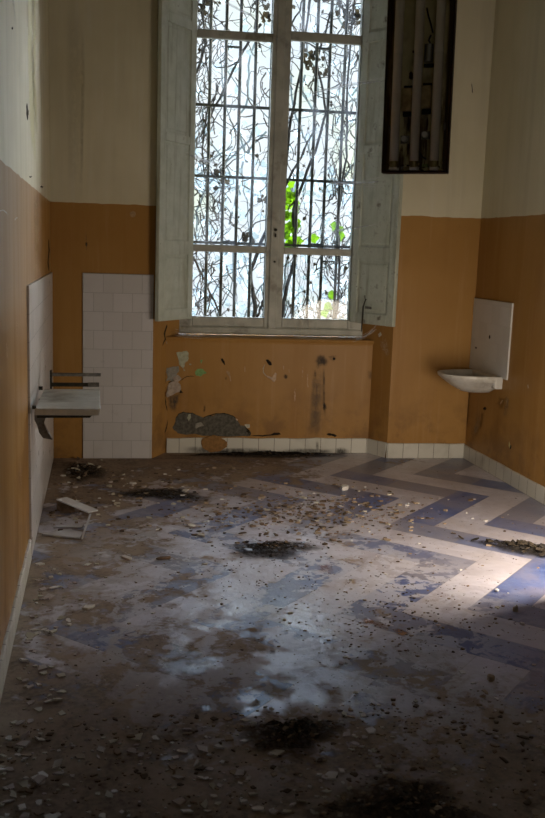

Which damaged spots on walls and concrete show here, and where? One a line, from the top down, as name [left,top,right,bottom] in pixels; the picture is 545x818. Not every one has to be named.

peeling [166,351,206,397]
flaking render [172,412,251,452]